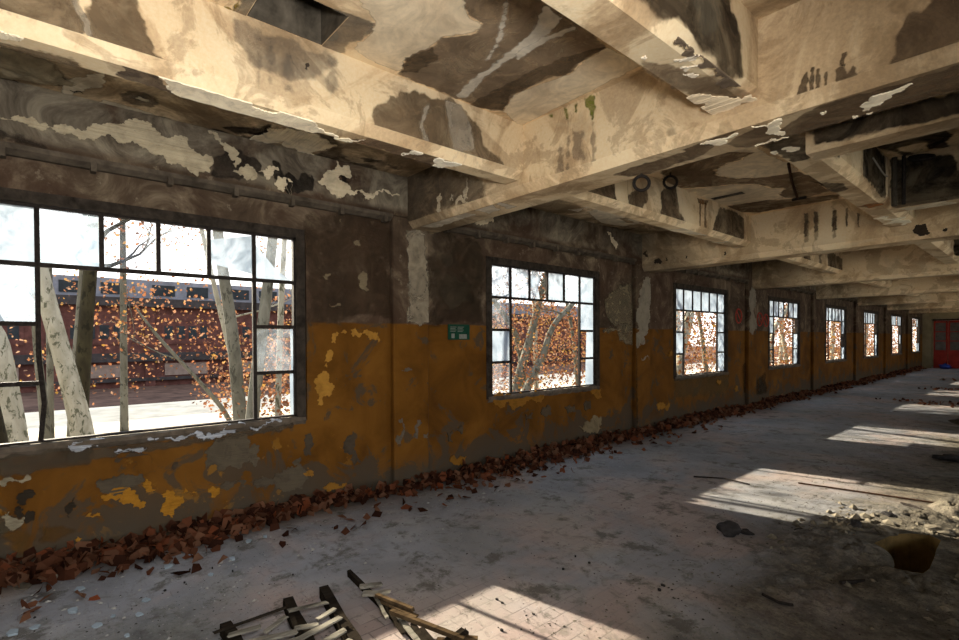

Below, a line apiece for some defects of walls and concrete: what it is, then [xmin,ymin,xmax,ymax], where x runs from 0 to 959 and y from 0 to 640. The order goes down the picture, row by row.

water stain [322,10,374,53]
water stain [891,0,959,64]
water stain [373,0,605,165]
peeling [673,37,758,115]
water stain [797,52,857,95]
peeling [1,115,214,176]
peeling [208,130,293,195]
peeling [159,76,361,155]
peeling [318,161,400,200]
water stain [353,138,438,170]
water stain [589,63,959,243]
spalling [0,422,314,531]